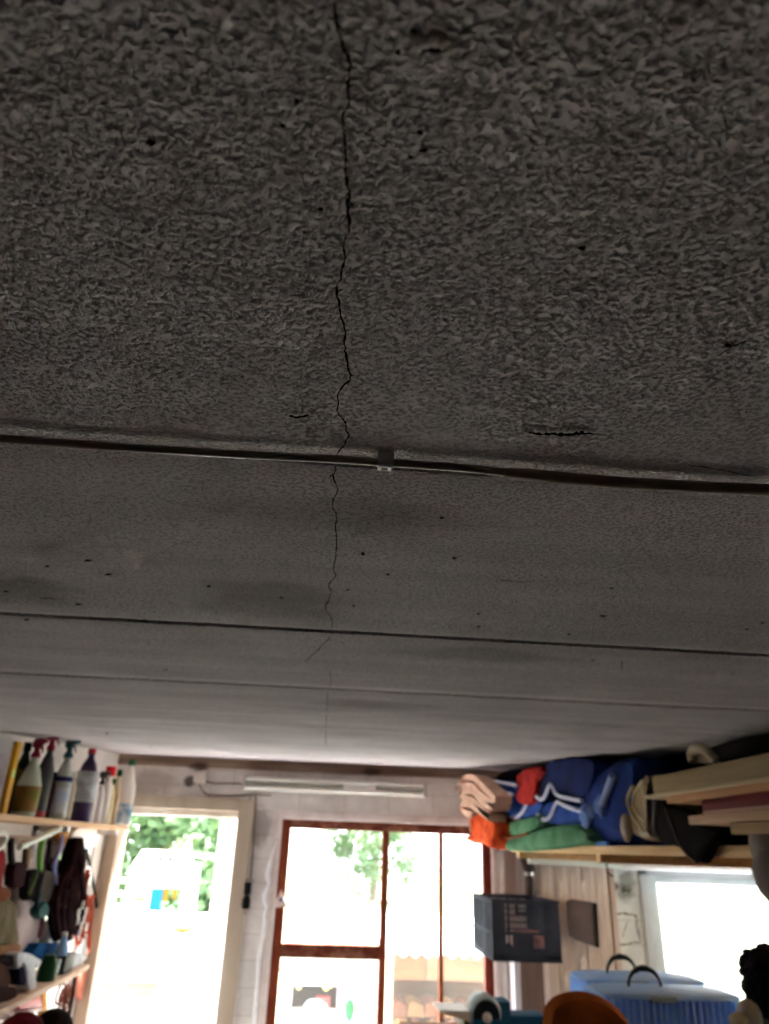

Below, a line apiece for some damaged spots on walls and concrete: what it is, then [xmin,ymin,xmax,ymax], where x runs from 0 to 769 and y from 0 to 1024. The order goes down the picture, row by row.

crack [305,1,354,744]